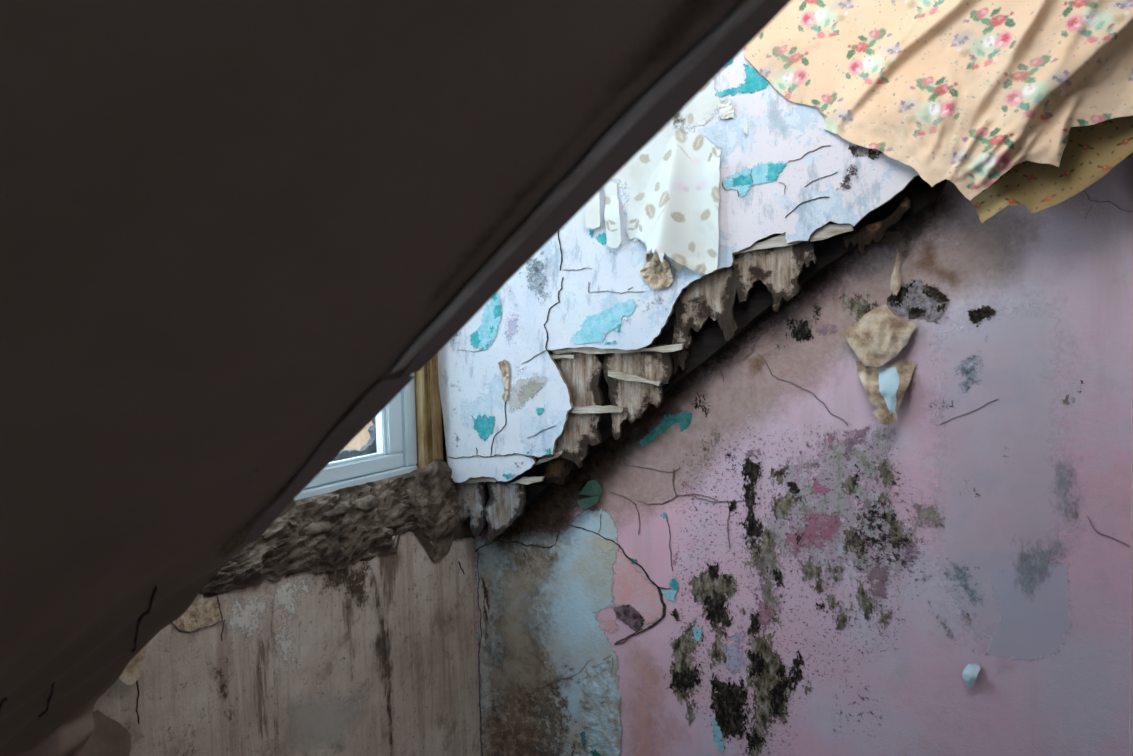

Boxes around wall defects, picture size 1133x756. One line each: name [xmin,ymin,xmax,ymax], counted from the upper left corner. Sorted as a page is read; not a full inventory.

spalling [848,143,882,160]
crack [524,232,642,363]
peeling [589,229,607,245]
peeling [498,359,509,402]
leakage [481,196,1008,756]
leakage [257,643,266,738]
leakage [316,545,398,746]
flaking render [171,459,679,756]
crack [475,459,738,756]